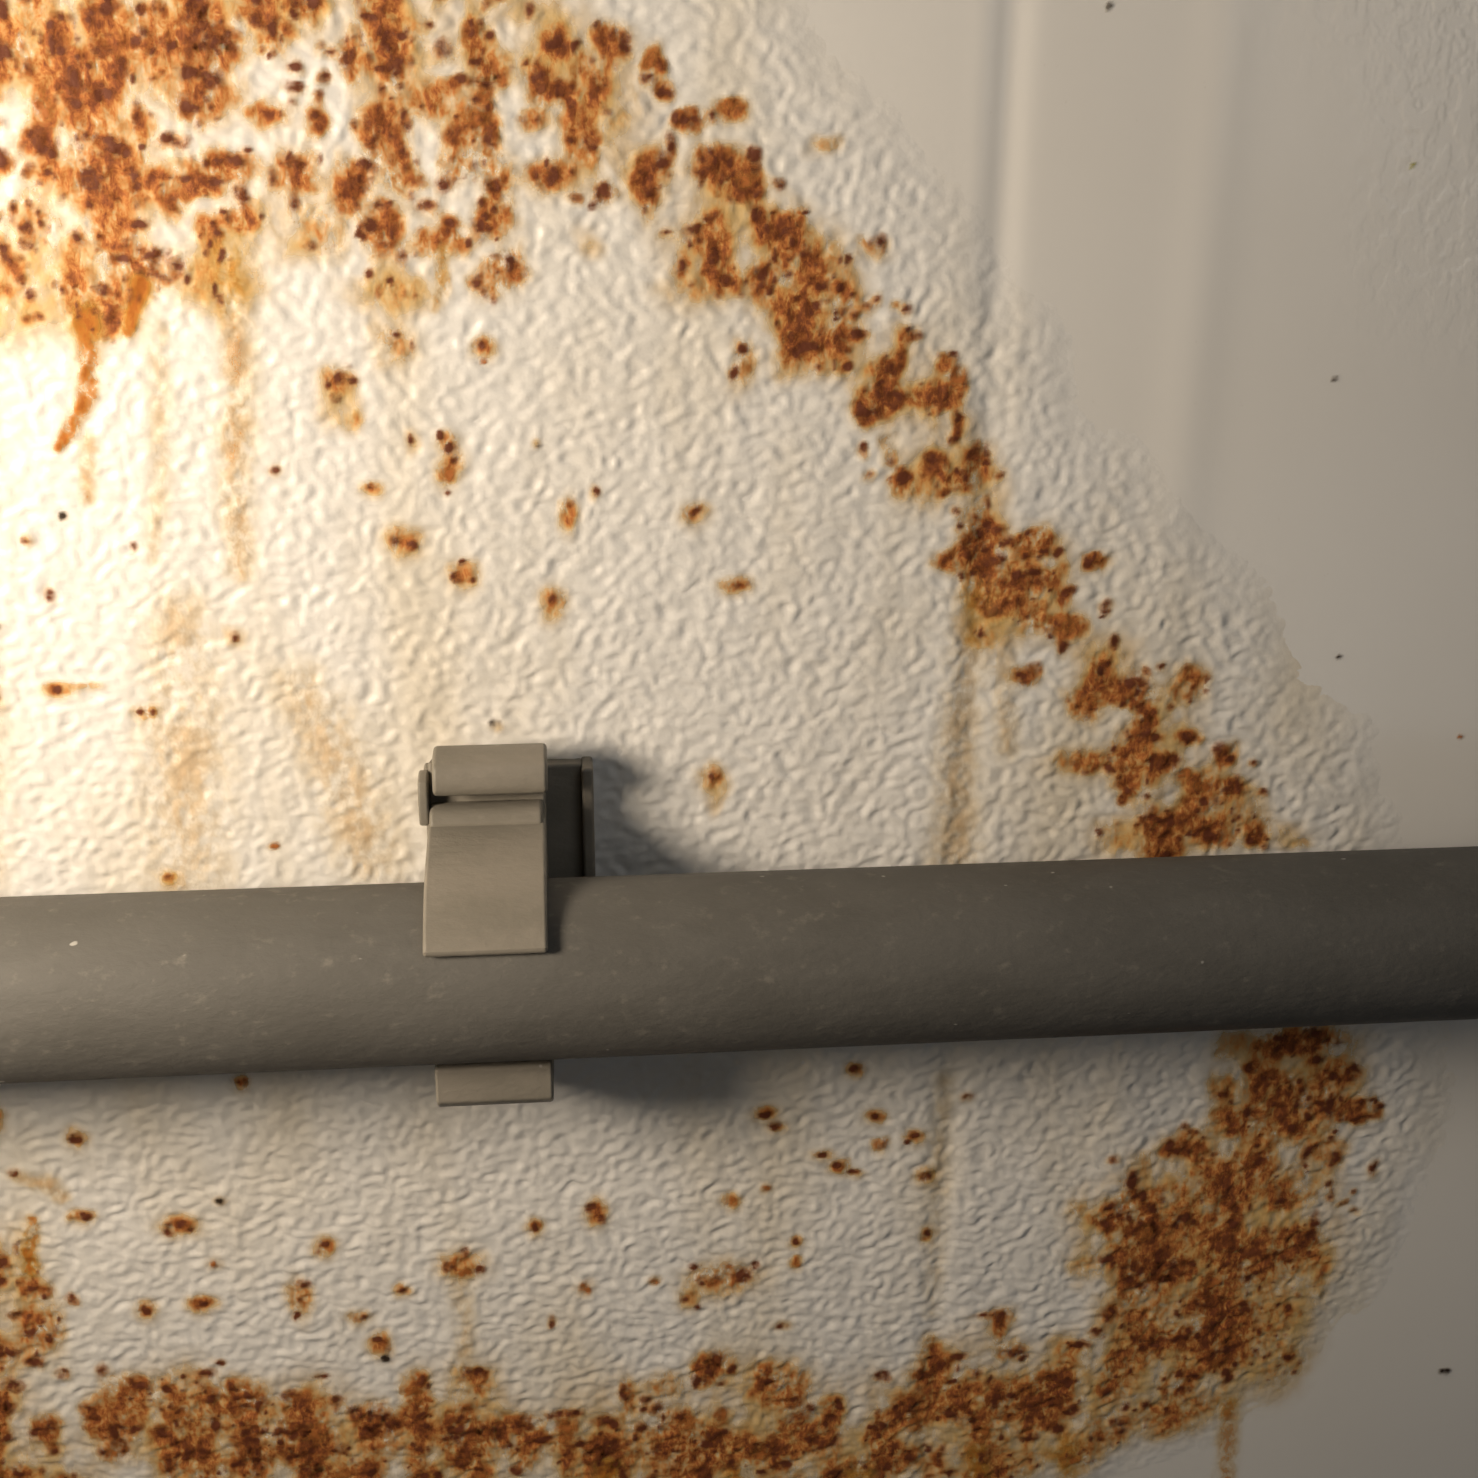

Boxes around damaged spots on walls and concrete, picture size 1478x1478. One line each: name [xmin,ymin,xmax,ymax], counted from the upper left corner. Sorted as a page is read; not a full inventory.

corrosion [0,0,1308,858]
corrosion [162,873,177,884]
corrosion [0,1216,83,1478]
corrosion [66,1129,88,1147]
corrosion [66,1210,95,1222]
corrosion [78,1025,1384,1478]